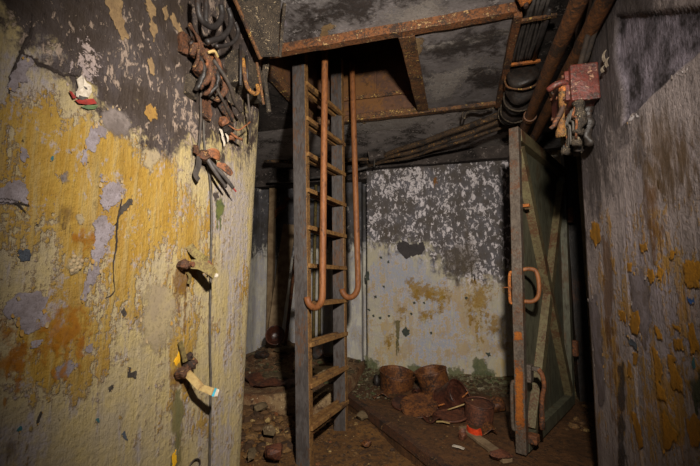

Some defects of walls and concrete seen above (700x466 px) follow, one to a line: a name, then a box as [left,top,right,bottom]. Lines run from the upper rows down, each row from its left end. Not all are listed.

peeling [144,0,183,42]
leakage [70,36,106,95]
peeling [81,106,131,166]
peeling [144,103,158,122]
peeling [144,147,160,172]
peeling [0,179,30,205]
peeling [76,173,133,303]
spalling [397,240,425,259]
leakage [467,233,485,285]
peeling [3,290,51,349]
peeling [588,295,605,406]
peeling [619,259,700,454]